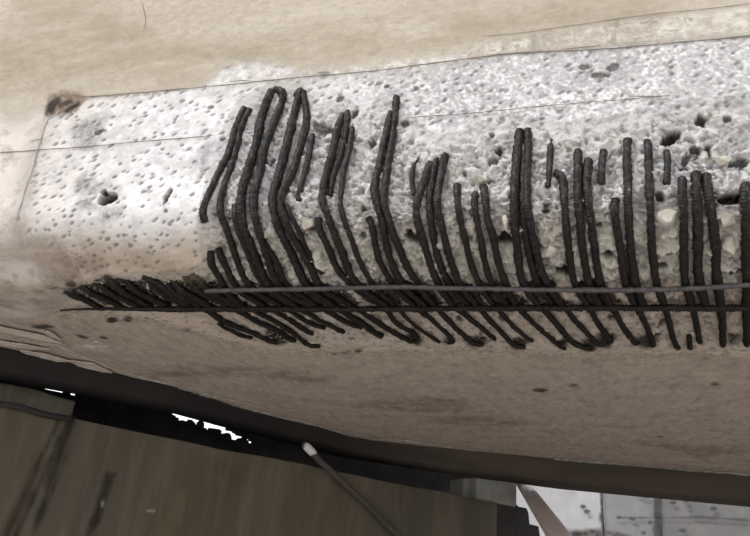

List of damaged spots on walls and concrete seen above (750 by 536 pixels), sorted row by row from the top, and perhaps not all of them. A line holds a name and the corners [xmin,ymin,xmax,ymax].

spalling [18,37,750,361]